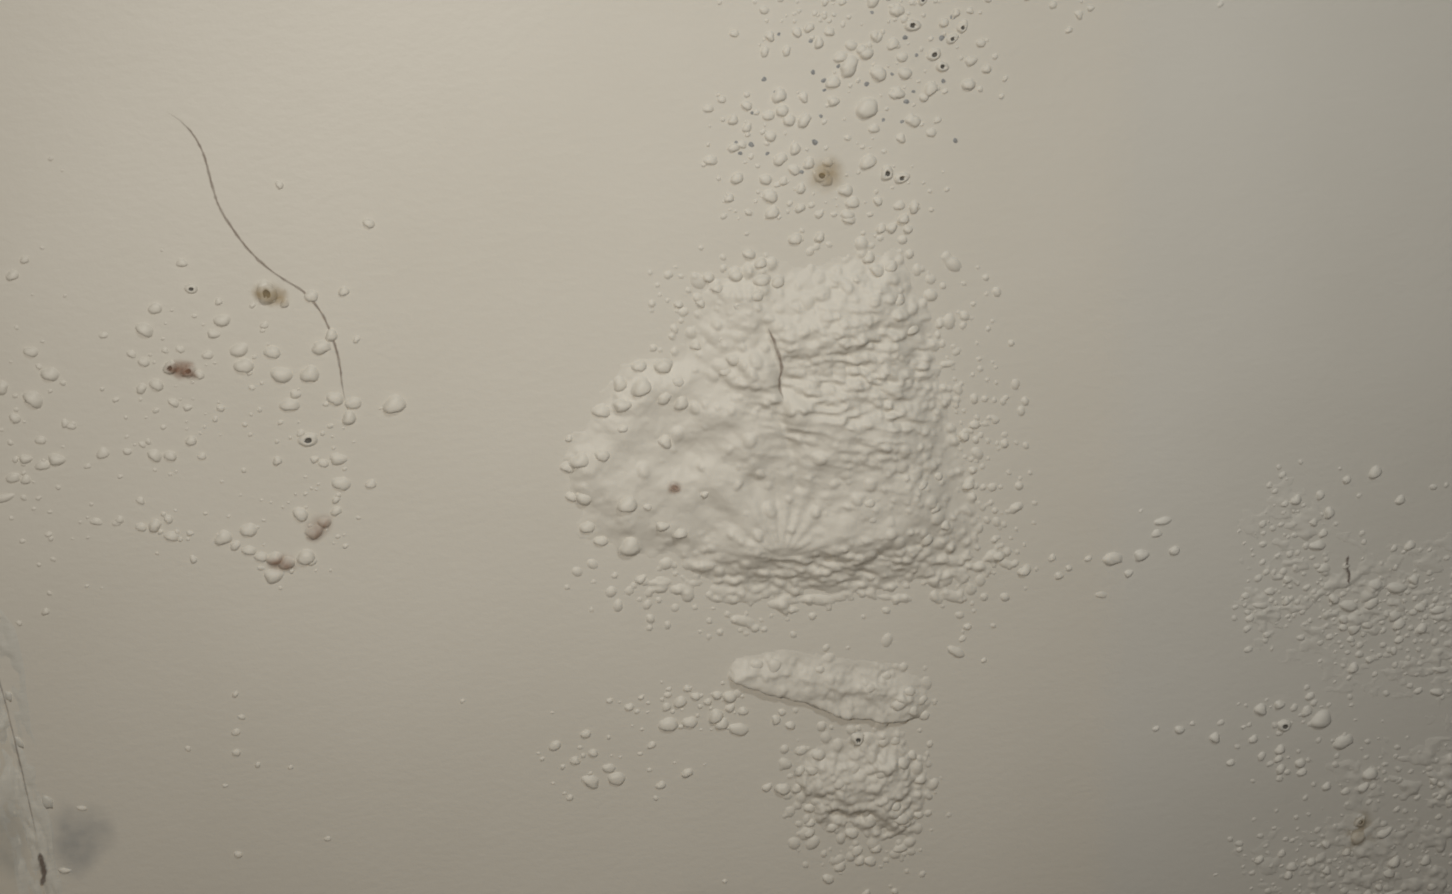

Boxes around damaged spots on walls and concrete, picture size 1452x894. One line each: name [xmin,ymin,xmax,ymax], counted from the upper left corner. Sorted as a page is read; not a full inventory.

crack [0,609,62,894]